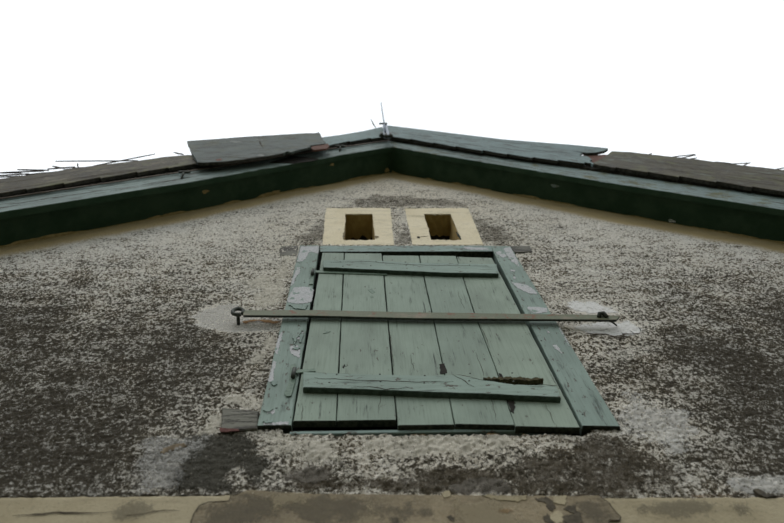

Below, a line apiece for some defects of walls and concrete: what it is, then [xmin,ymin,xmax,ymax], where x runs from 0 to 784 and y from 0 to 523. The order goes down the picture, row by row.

peeling [287,246,319,310]
peeling [268,328,304,386]
peeling [263,409,289,425]
leakage [166,433,274,494]
flaking render [190,477,621,523]